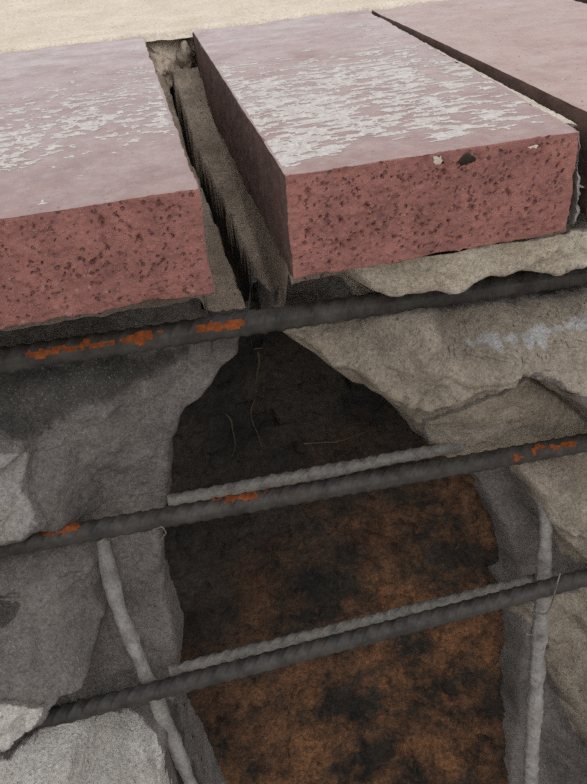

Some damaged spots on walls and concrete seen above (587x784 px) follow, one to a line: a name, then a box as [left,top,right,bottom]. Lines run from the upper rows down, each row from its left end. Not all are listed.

crack [171,87,261,304]
corrosion [196,319,245,333]
corrosion [25,330,164,360]
corrosion [513,440,578,462]
corrosion [212,490,269,504]
spalling [0,229,587,784]
corrosion [36,522,81,537]